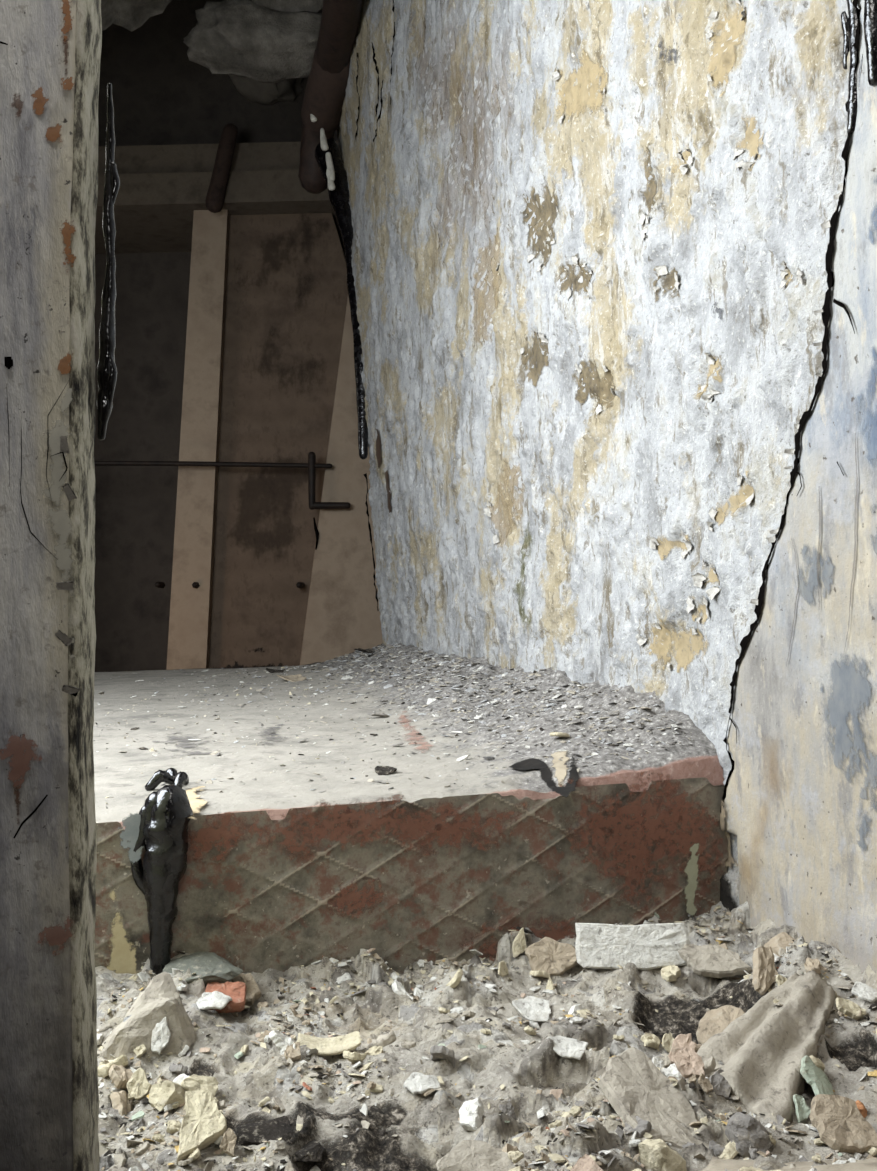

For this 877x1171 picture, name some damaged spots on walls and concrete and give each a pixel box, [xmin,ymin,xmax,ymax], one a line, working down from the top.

rust [61,0,75,90]
peeling [705,0,747,97]
rust [11,87,49,117]
rust [45,123,62,142]
peeling [638,143,657,242]
rust [60,220,76,272]
peeling [520,177,594,301]
peeling [652,265,680,307]
peeling [520,328,549,387]
peeling [573,359,617,416]
crack [720,0,861,813]
peeling [636,530,721,673]